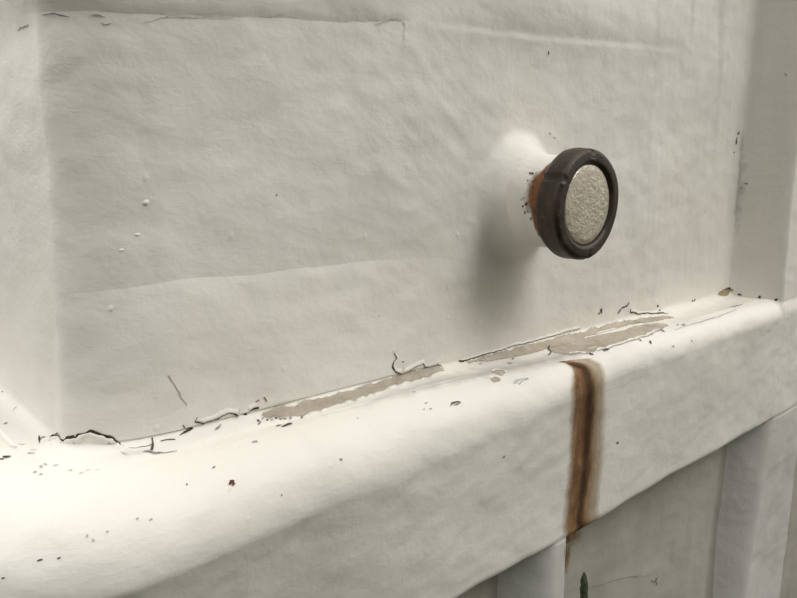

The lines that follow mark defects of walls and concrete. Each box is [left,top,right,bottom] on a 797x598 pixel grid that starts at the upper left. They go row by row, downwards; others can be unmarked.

corrosion [521,164,550,238]
peeling [467,305,685,382]
crack [38,397,267,455]
peeling [257,366,443,427]
peeling [447,398,463,408]
corrosion [559,359,603,566]